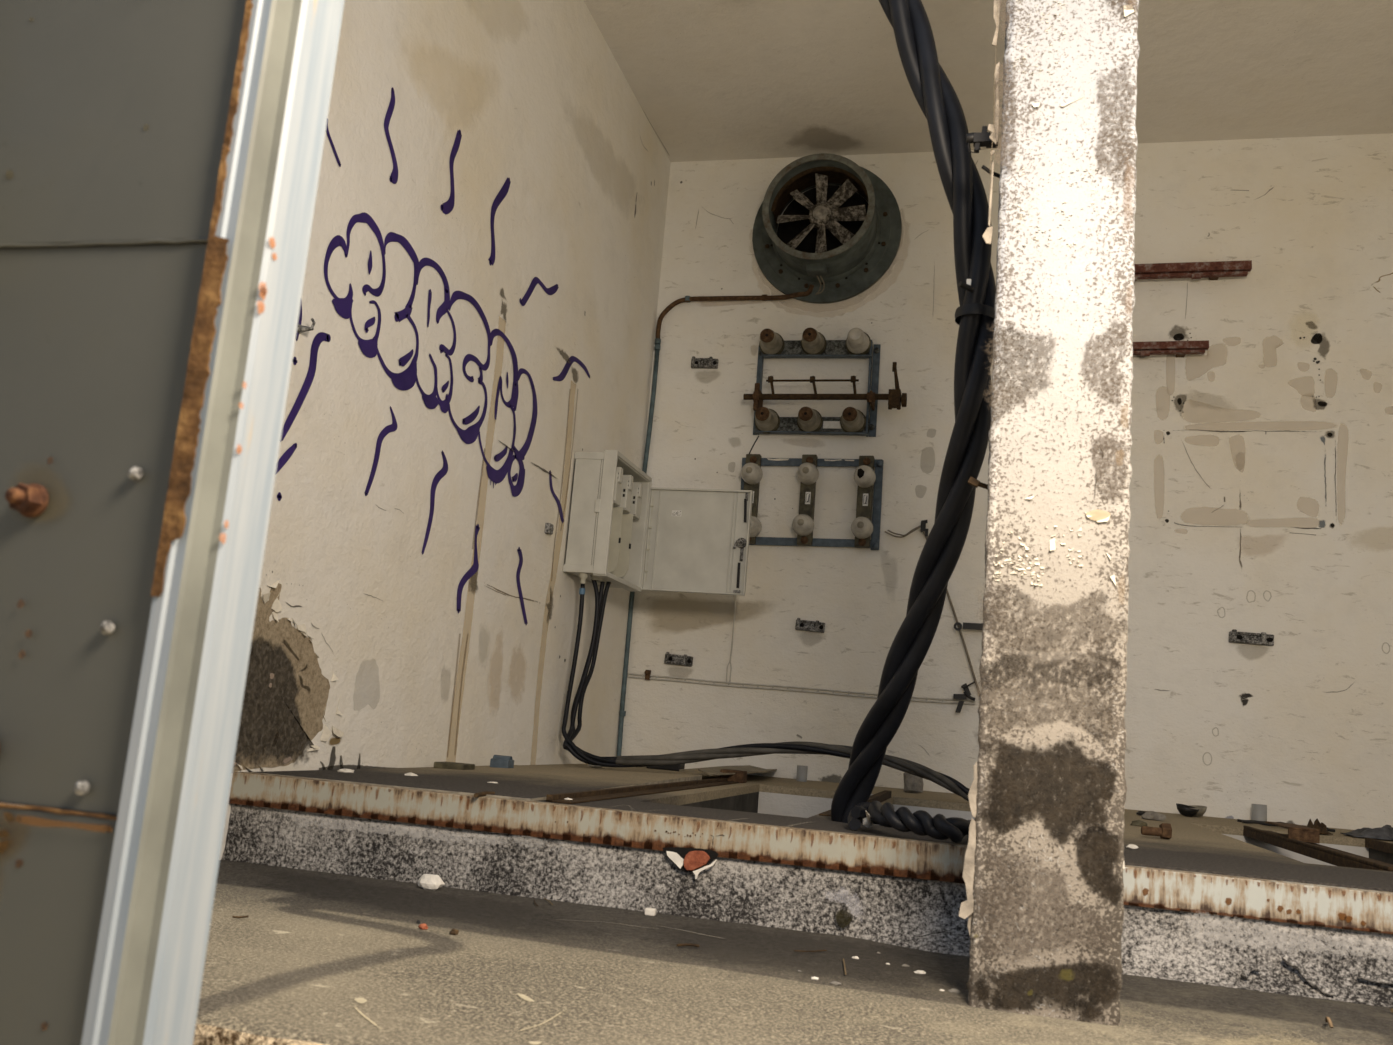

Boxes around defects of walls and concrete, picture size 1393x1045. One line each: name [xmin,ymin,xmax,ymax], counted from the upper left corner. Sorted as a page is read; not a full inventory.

corrosion [151,0,254,597]
corrosion [257,282,267,314]
spalling [1299,322,1329,409]
peeling [232,580,344,773]
water stain [977,584,1125,904]
corrosion [0,813,112,868]
corrosion [229,776,965,884]
water stain [968,850,1120,1020]
corrosion [1124,869,1393,934]